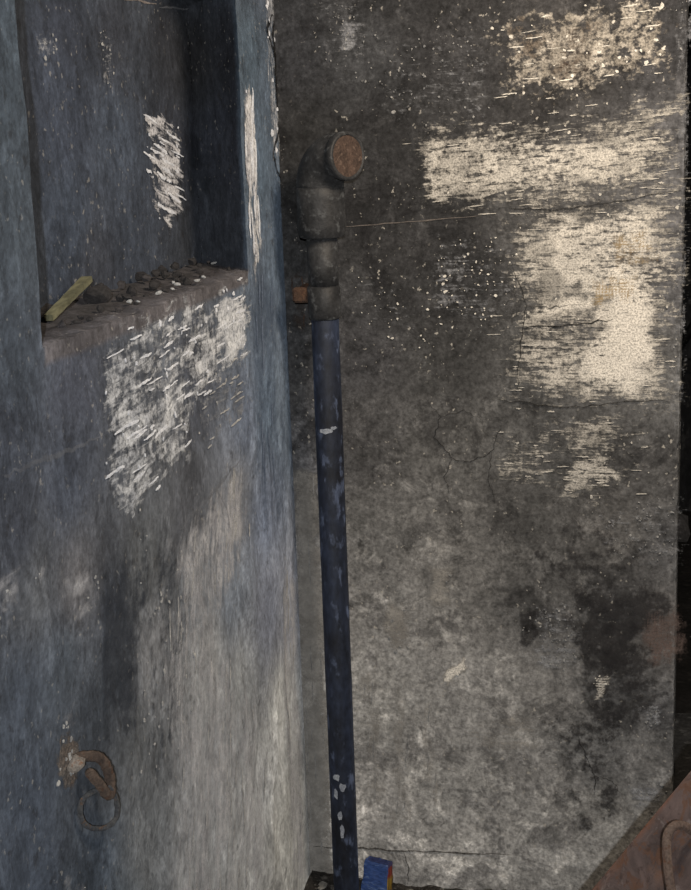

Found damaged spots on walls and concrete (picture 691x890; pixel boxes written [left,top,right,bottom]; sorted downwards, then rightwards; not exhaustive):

leakage [549,582,671,780]